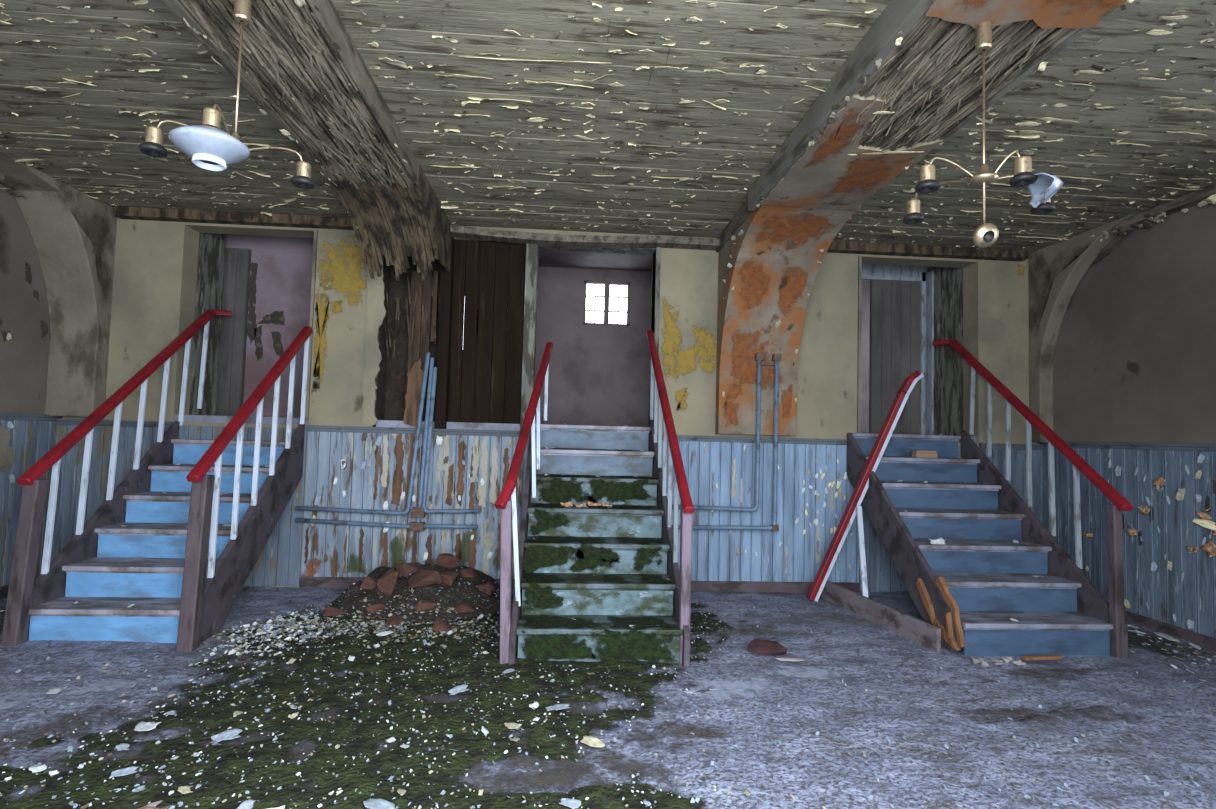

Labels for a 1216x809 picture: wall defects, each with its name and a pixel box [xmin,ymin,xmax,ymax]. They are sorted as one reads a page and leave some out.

peeling [0,3,348,217]
peeling [351,0,877,233]
rust [805,109,866,167]
rust [825,158,913,197]
peeling [722,10,1216,330]
peeling [0,421,16,484]
spalling [333,246,511,575]
spalling [722,332,797,425]
rust [302,558,321,577]
peeling [304,495,321,564]
peeling [1093,453,1216,557]
peeling [1150,554,1184,582]